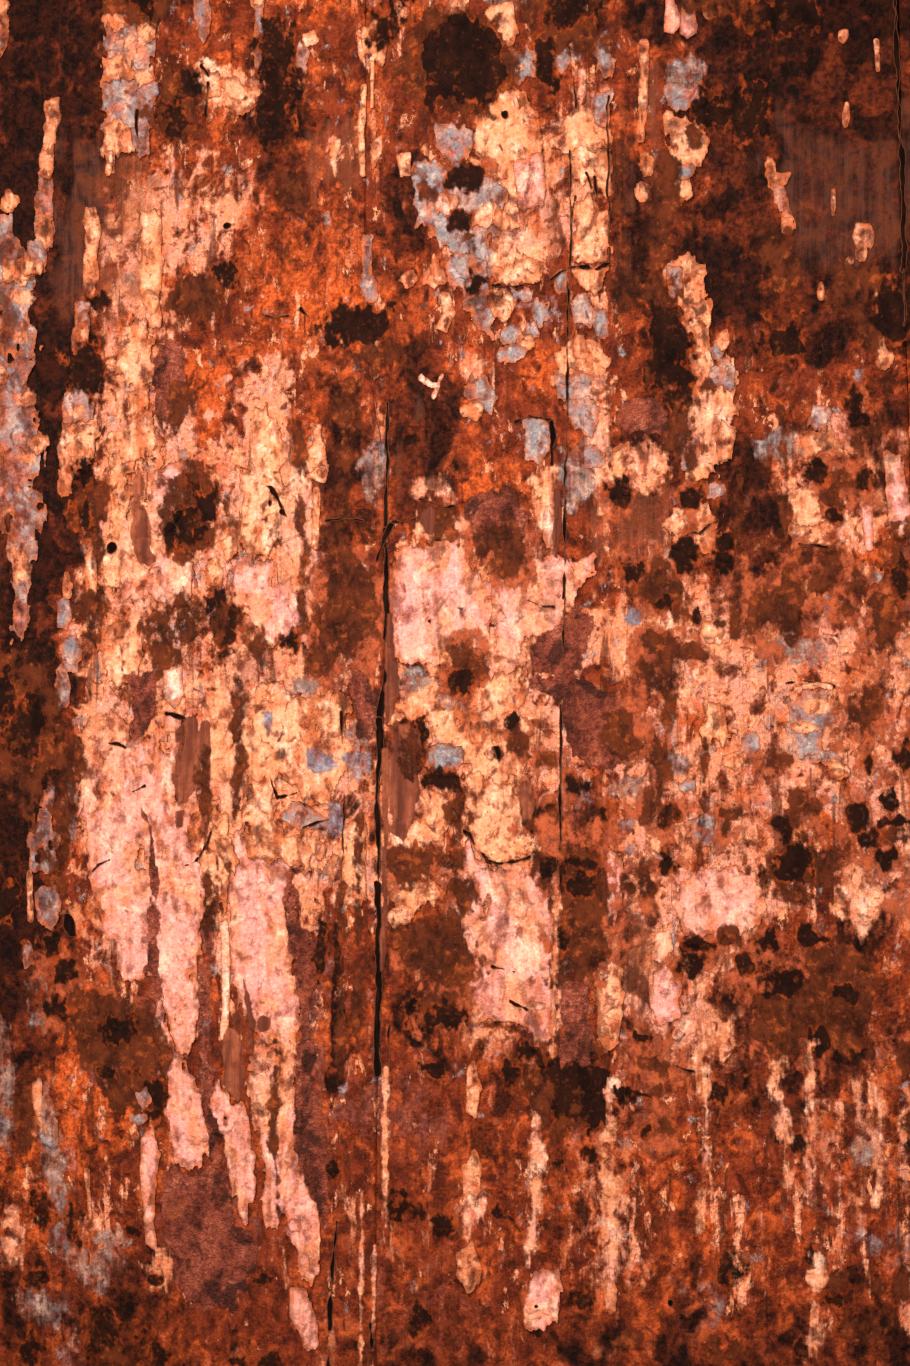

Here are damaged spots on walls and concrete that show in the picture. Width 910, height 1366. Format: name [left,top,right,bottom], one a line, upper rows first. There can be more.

corrosion [364,0,615,124]
peeling [634,0,714,207]
corrosion [156,459,242,566]
corrosion [132,586,301,681]
peeling [0,0,696,1366]
crack [267,401,456,1078]
corrosion [487,149,910,993]
peeling [661,251,740,559]
corrosion [386,794,490,1080]
corrosion [496,919,910,1171]
peeling [649,863,767,1234]
peeling [767,1040,819,1206]